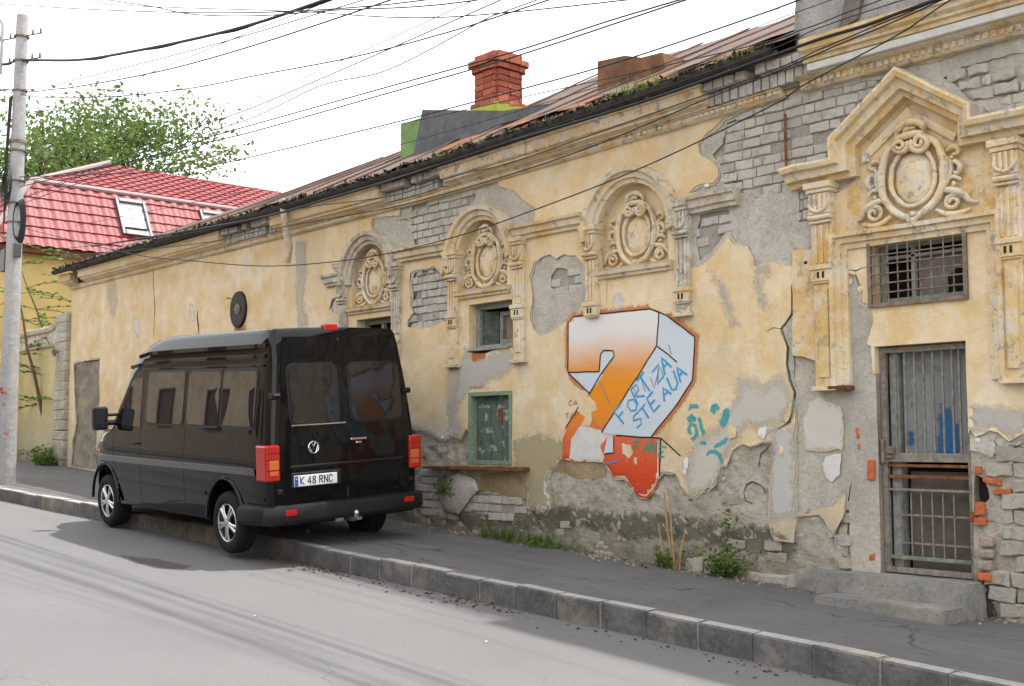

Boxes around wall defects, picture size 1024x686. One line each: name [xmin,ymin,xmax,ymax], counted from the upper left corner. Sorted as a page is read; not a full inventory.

spalling [902,36,1024,114]
spalling [692,52,889,267]
flaking render [373,168,535,249]
spalling [409,269,447,328]
flaking render [532,255,585,335]
crack [728,314,798,504]
flaking render [795,274,881,572]
spalling [416,469,529,535]
flaking render [550,521,572,536]
flaking render [712,497,803,563]
flaking render [970,431,1024,624]